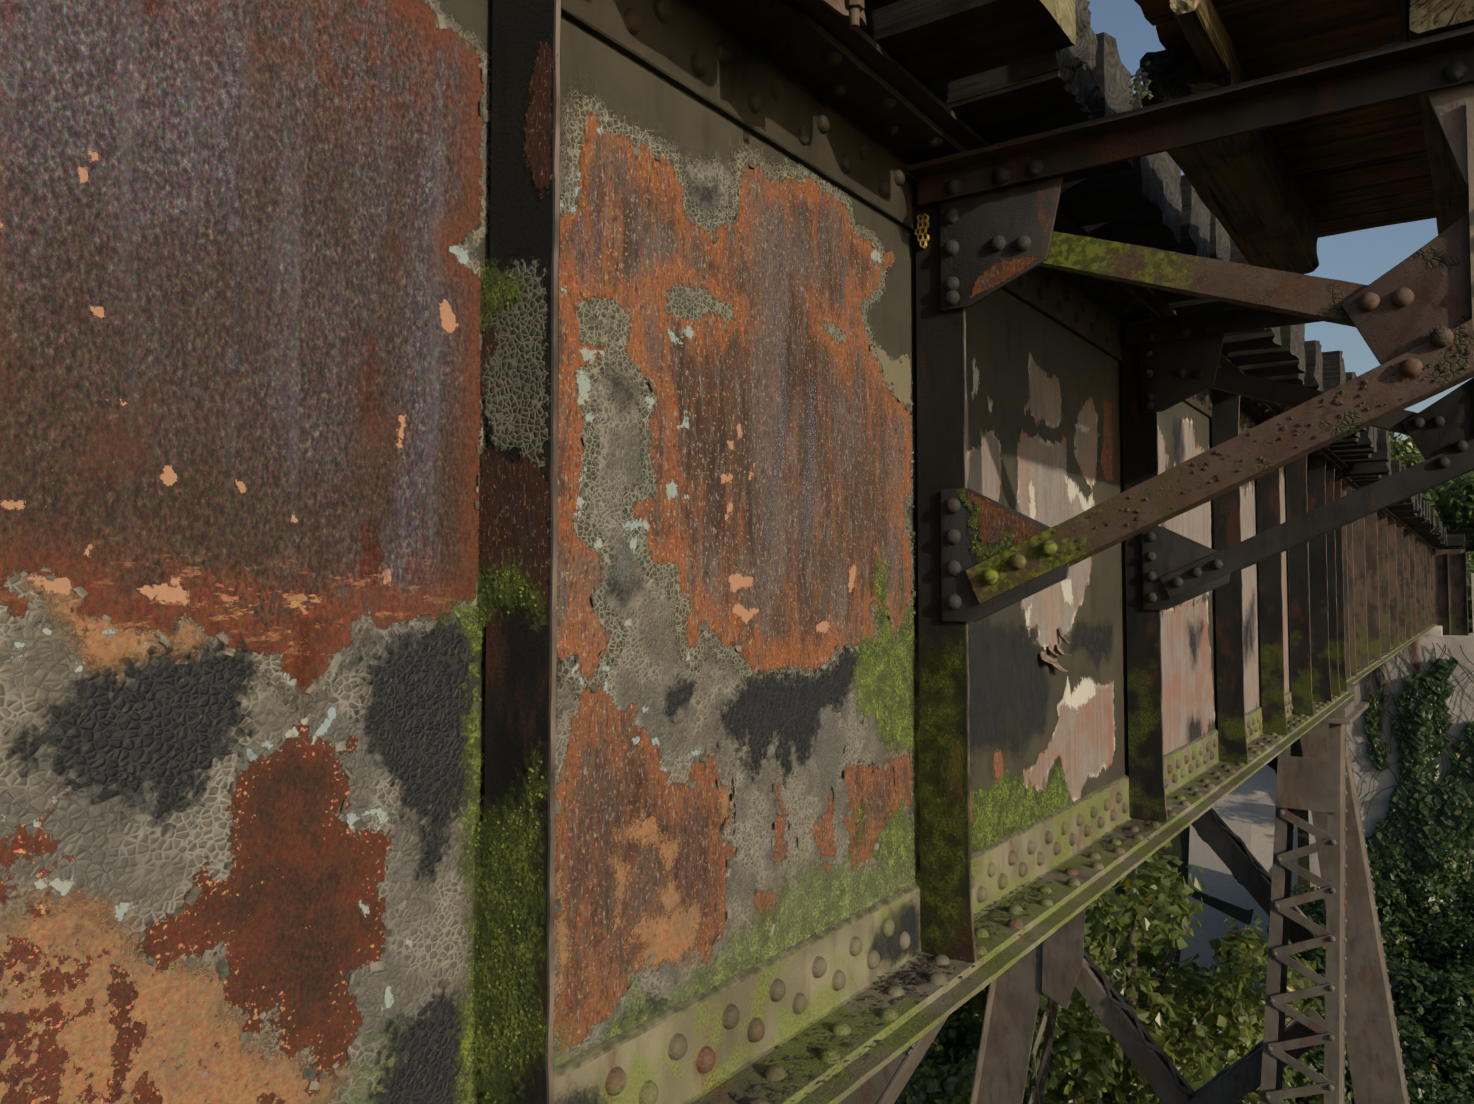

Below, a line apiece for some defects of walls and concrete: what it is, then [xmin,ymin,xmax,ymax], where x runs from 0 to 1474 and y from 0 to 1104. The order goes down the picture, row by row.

rust [970,254,1039,299]
peeling [576,347,606,423]
peeling [966,351,1101,527]
rust [1100,399,1113,481]
peeling [1158,418,1209,475]
rust [0,0,916,1104]
rust [967,491,1045,545]
peeling [1159,501,1212,549]
peeling [1021,557,1116,801]
peeling [1161,592,1215,755]
peeling [246,707,336,762]
peeling [34,872,75,896]